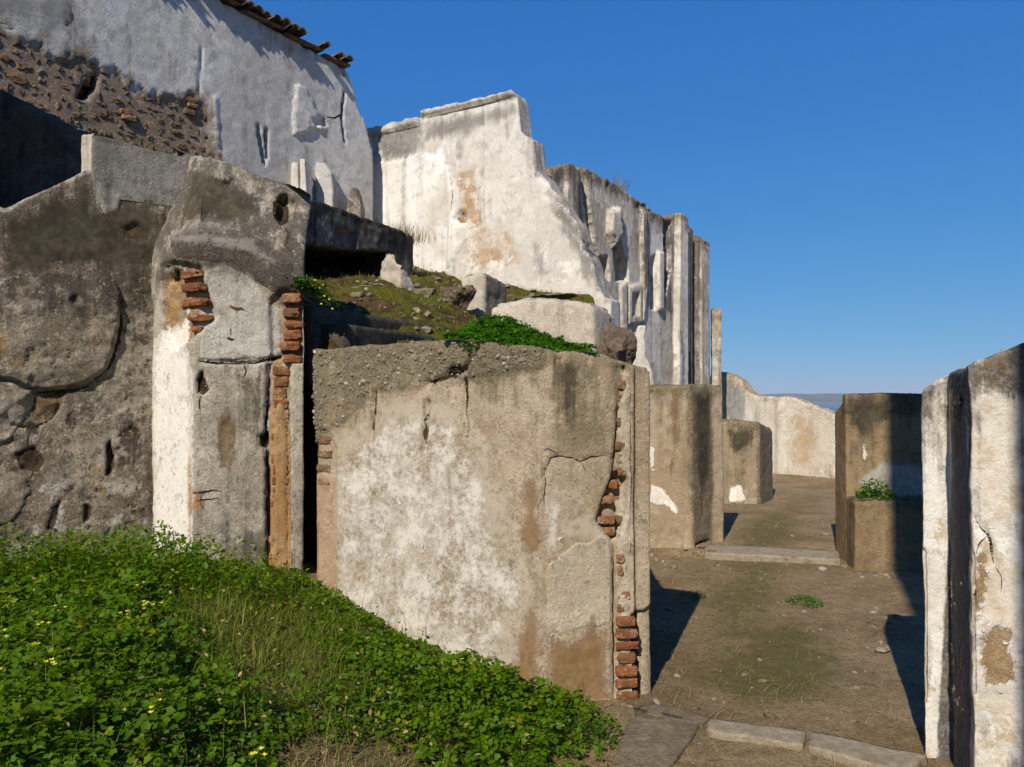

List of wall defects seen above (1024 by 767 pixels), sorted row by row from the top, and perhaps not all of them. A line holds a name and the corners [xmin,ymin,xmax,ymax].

peeling [152,265,639,700]
crack [538,404,619,509]
peeling [650,485,678,514]
crack [976,520,1002,588]
crack [609,558,617,684]
peeling [976,552,1016,693]